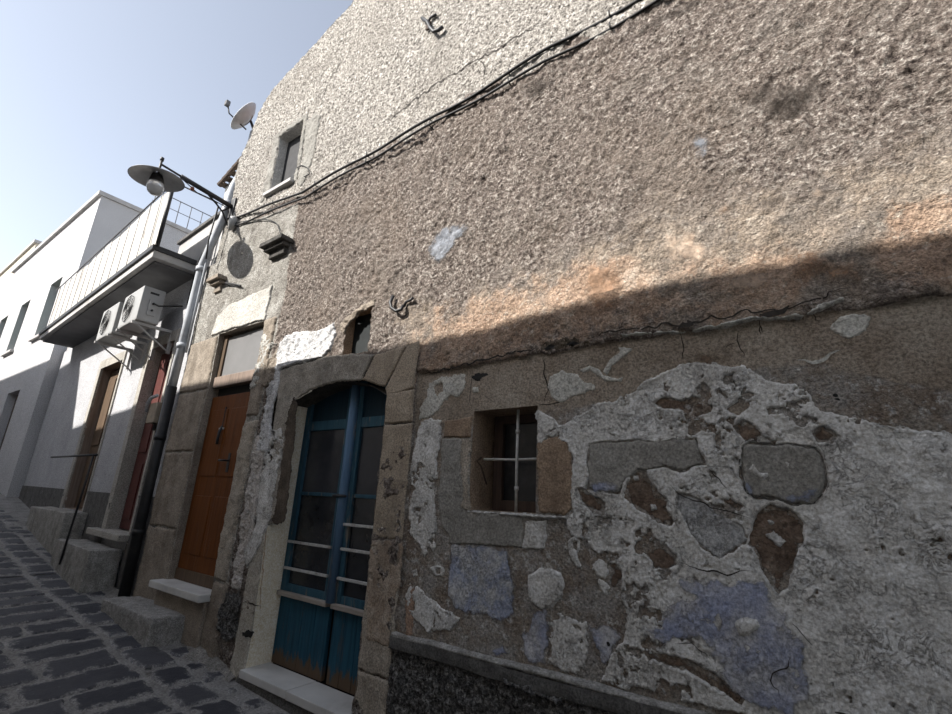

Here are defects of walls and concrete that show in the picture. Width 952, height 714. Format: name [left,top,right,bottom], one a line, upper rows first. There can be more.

crack [421,348,560,405]
spalling [539,337,590,352]
peeling [547,297,844,403]
crack [588,287,850,357]
peeling [830,314,871,339]
peeling [231,323,337,592]
peeling [366,362,952,714]